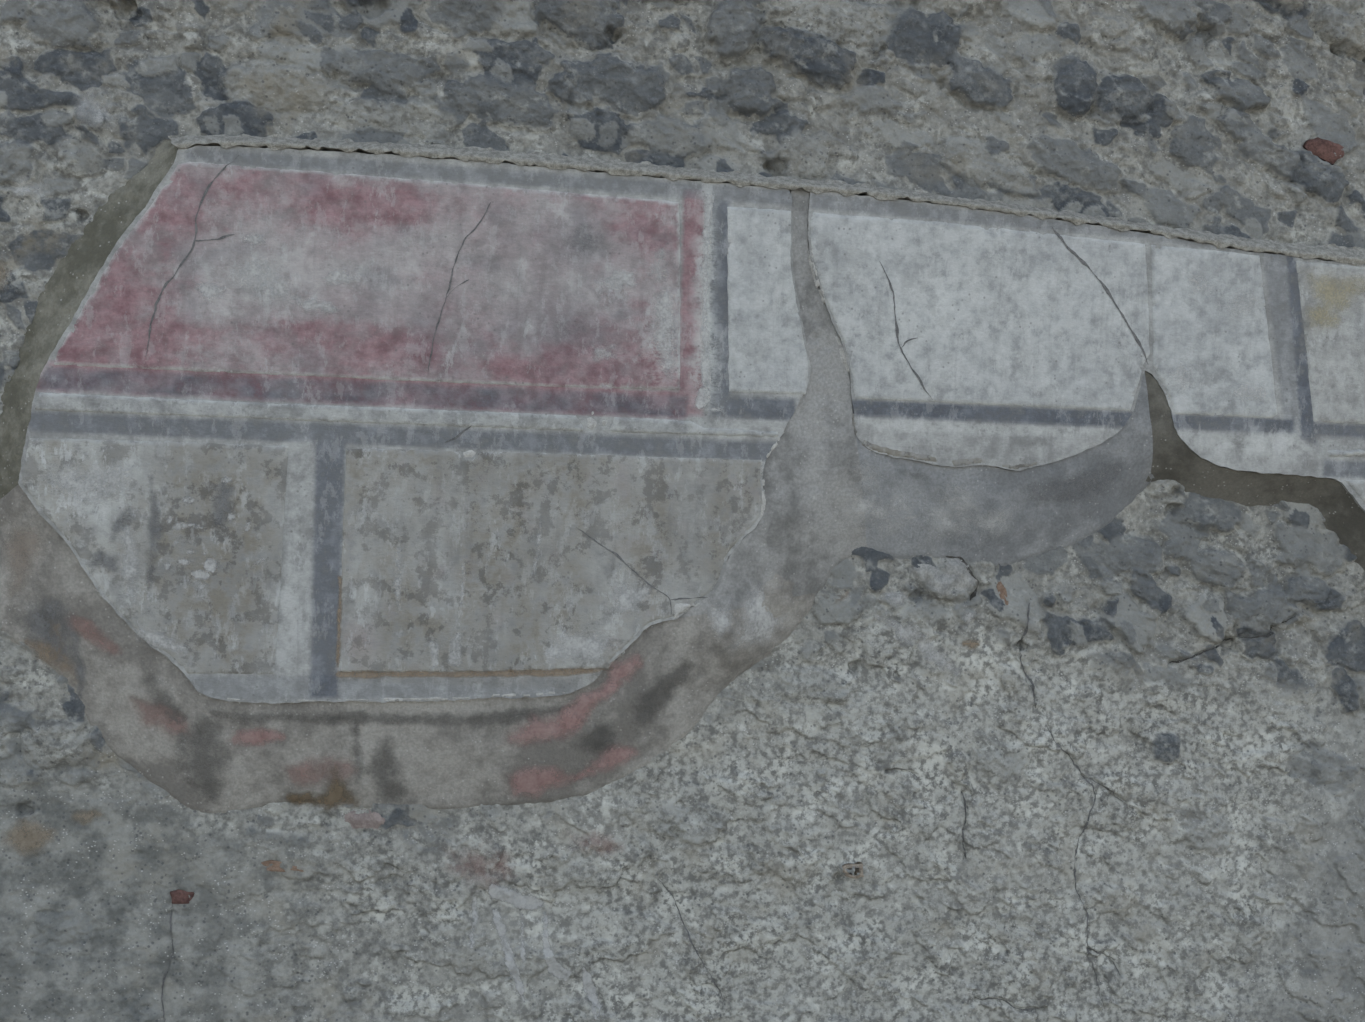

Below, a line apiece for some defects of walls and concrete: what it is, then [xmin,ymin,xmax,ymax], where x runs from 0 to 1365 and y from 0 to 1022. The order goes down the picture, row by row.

crack [146,155,239,354]
crack [428,202,491,370]
crack [879,261,933,400]
crack [1052,227,1148,364]
flaking render [760,438,780,517]
peeling [165,516,216,589]
peeling [138,631,181,649]
flaking render [674,602,700,618]
crack [1169,616,1295,663]
crack [960,793,968,858]
crack [1017,603,1125,1005]
crack [976,997,1039,1011]